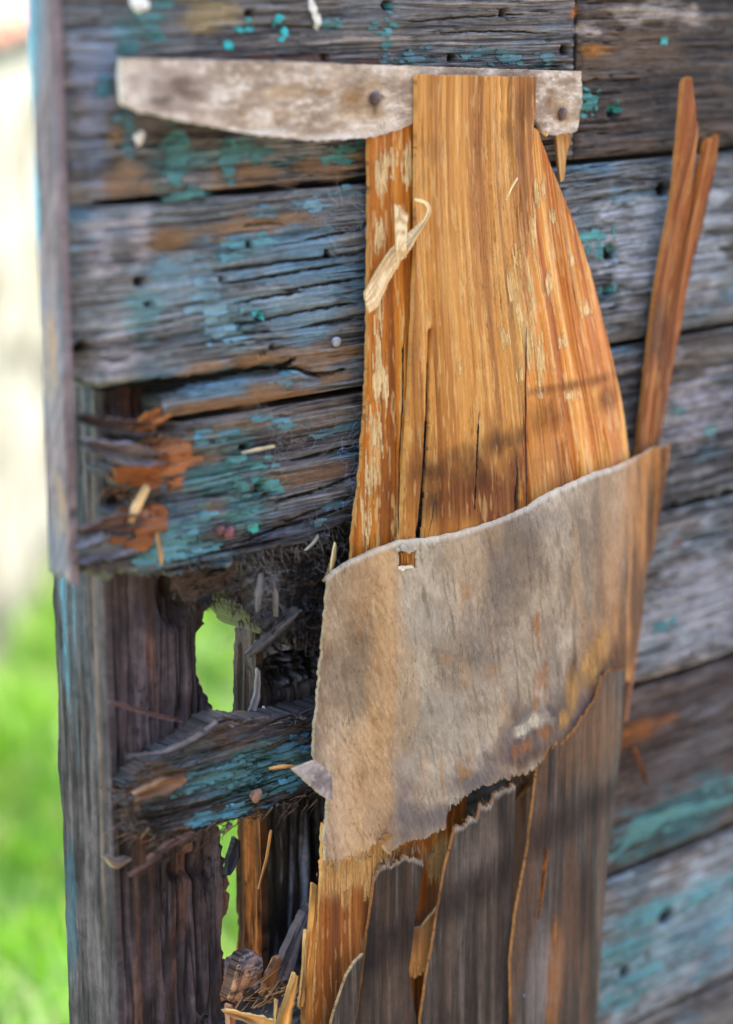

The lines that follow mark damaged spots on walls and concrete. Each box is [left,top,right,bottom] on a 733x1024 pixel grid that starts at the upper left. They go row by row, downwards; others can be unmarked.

peeling [112,105,139,168]
peeling [149,119,205,202]
peeling [217,137,300,186]
peeling [318,140,366,166]
peeling [193,429,241,446]
peeling [250,414,361,440]
crack [398,340,436,538]
crack [473,412,481,509]
crack [515,325,527,508]
peeling [131,454,287,572]
peeling [314,500,348,527]
peeling [170,732,312,828]